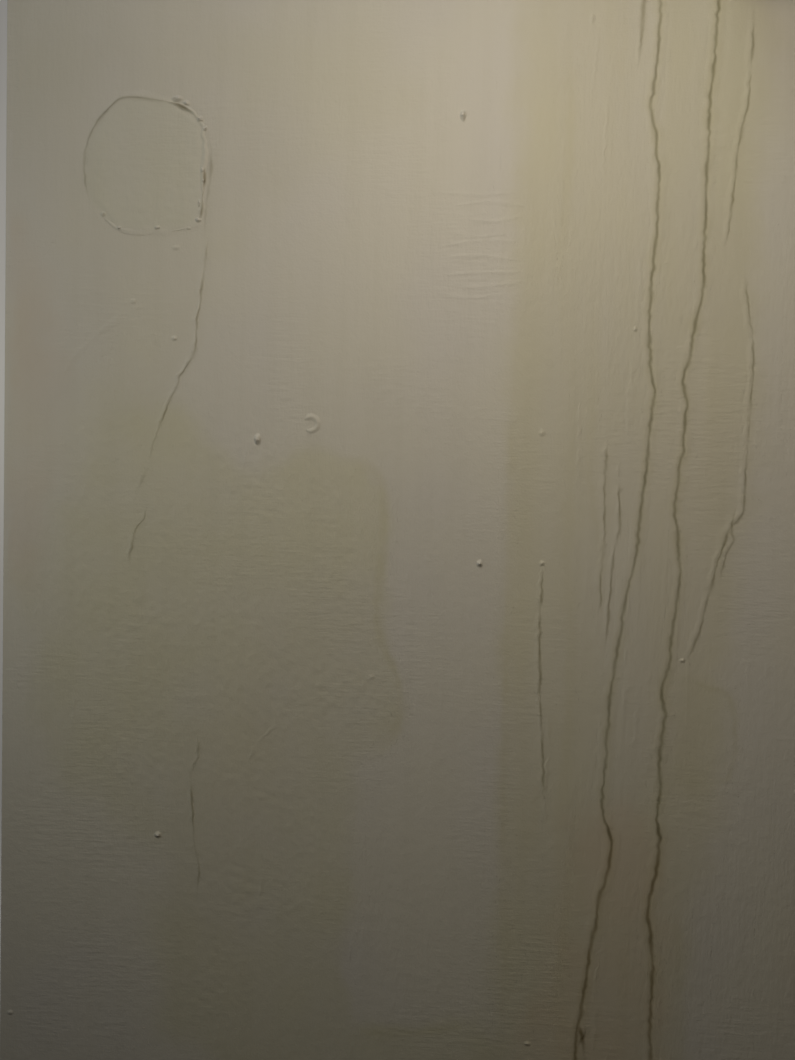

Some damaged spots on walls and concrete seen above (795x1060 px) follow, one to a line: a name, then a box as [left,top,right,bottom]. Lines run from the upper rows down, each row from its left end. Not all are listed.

crack [125,239,210,562]
crack [565,0,756,1060]